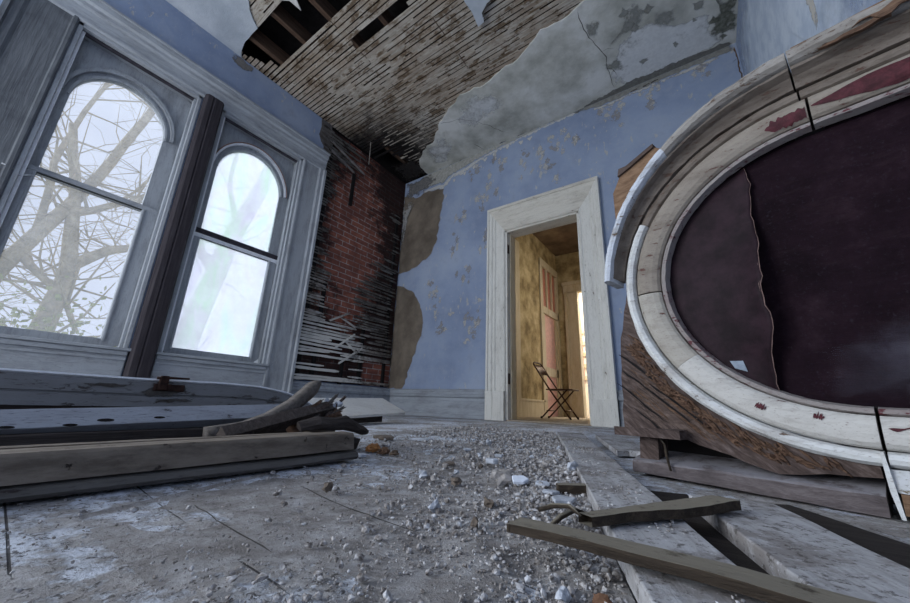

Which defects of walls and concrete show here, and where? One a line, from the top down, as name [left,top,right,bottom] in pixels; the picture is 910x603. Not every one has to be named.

flaking render [242,0,732,389]
crack [578,15,617,85]